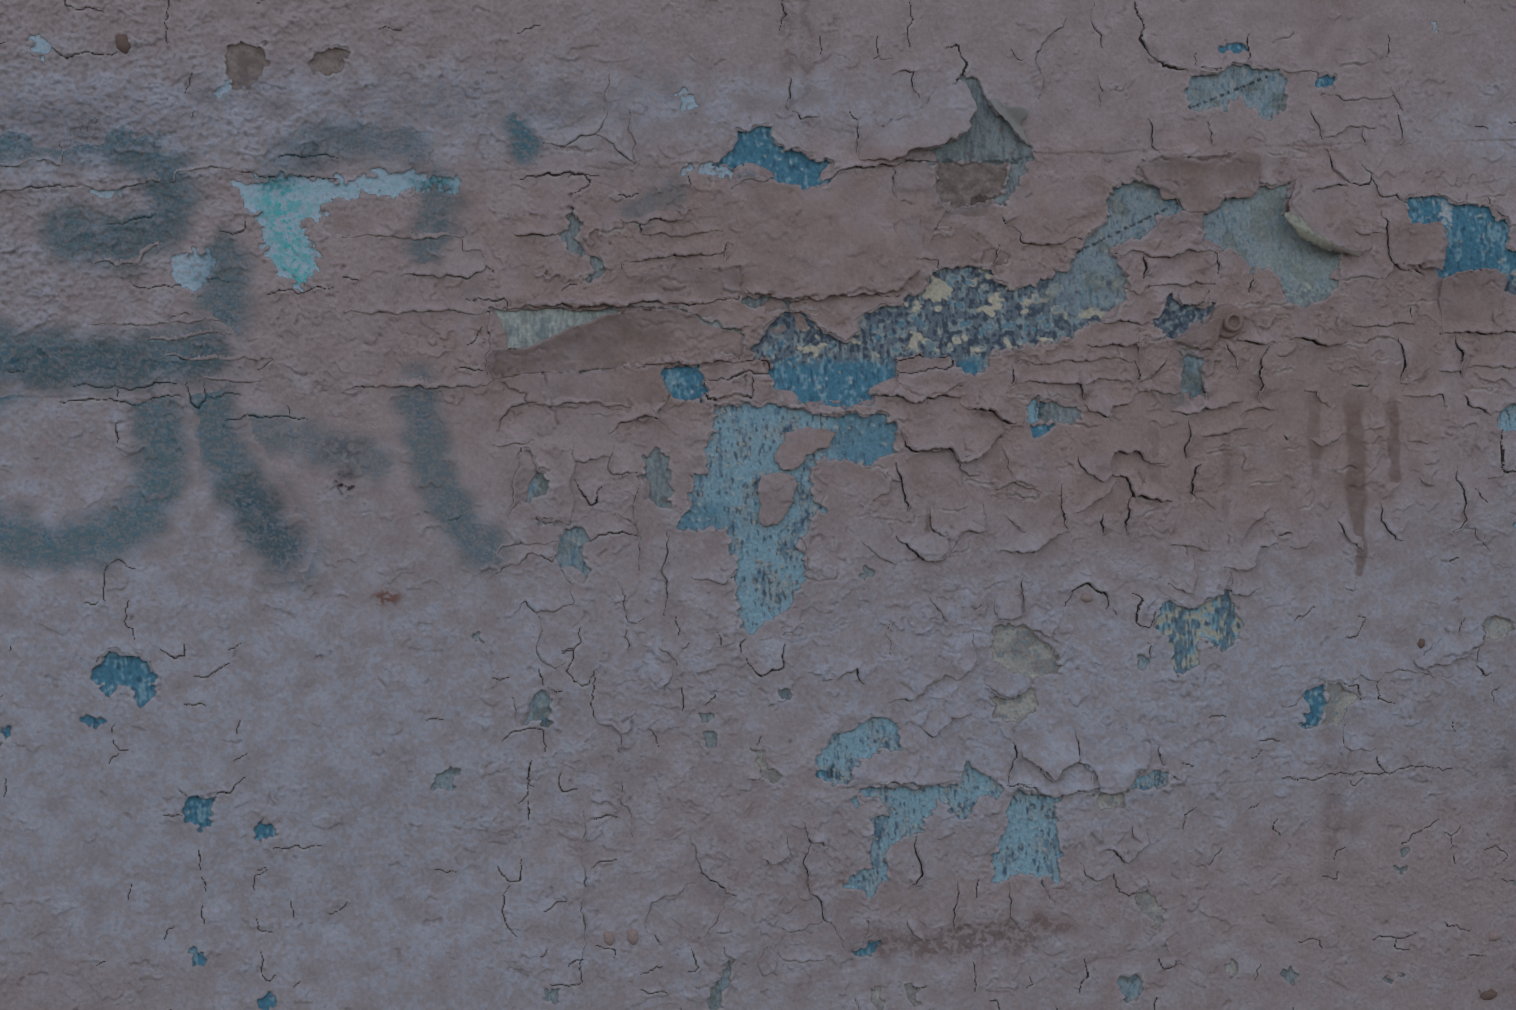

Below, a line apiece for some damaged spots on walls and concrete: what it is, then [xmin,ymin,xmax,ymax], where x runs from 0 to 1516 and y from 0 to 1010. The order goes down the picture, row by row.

crack [84,559,241,706]
crack [0,144,338,443]
peeling [231,168,461,292]
crack [253,74,900,1010]
peeling [681,120,834,190]
peeling [488,149,1373,635]
crack [786,1,1082,269]
peeling [858,75,1035,208]
peeling [816,590,1168,898]
crack [862,1,1516,836]
peeling [1397,187,1516,333]
crack [973,959,1089,1010]